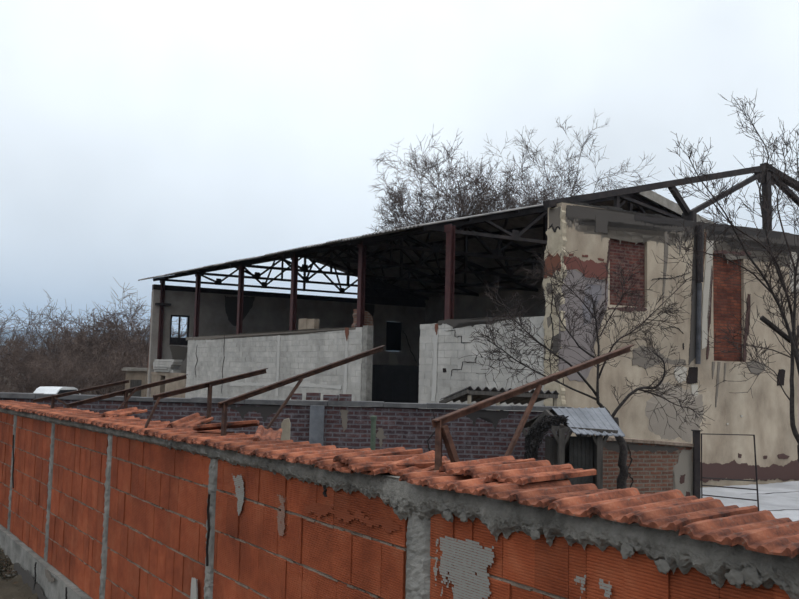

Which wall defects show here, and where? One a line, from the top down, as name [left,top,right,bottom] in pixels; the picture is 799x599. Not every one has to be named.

crack [444,330,477,376]
spalling [544,240,647,382]